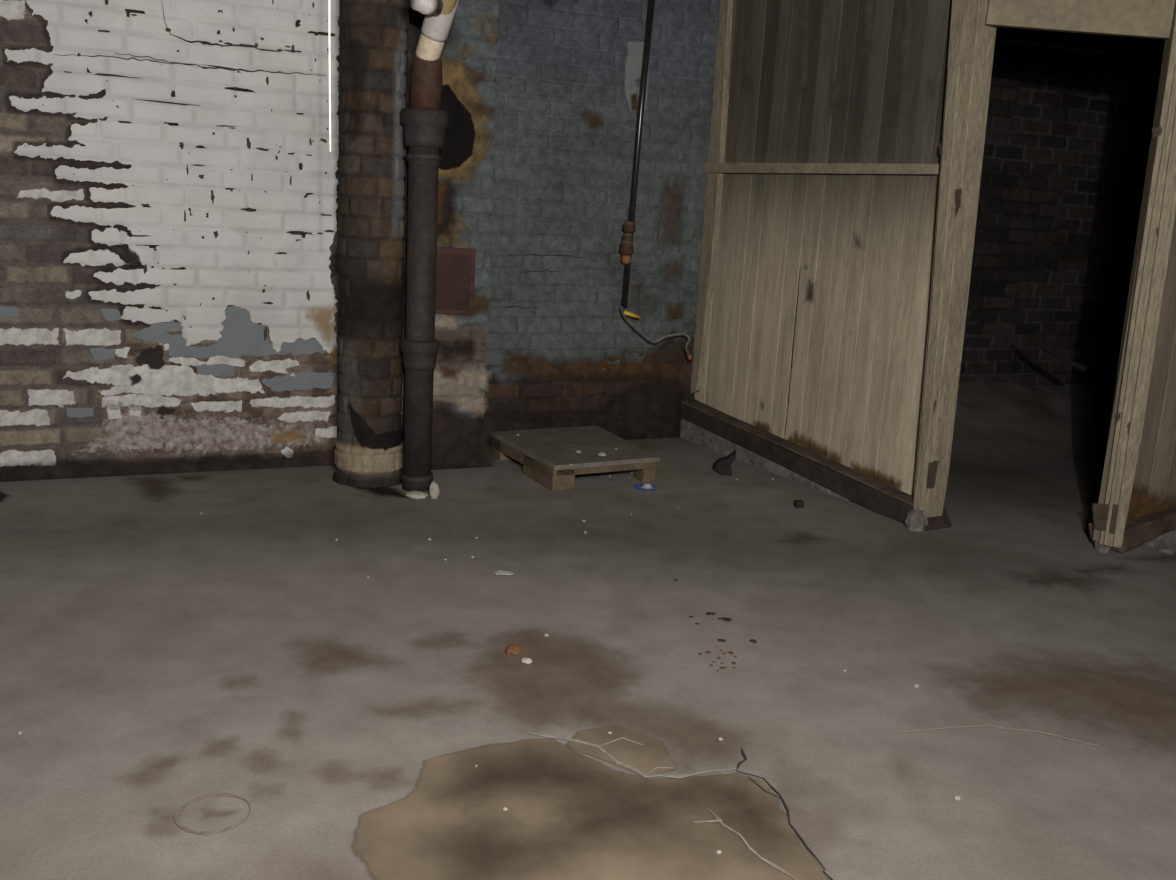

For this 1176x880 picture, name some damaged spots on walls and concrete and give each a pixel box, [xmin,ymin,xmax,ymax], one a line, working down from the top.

peeling [0,0,339,438]
peeling [0,449,56,467]
spalling [349,403,402,450]
rust [503,352,678,379]
damp [352,726,828,880]
crack [528,732,833,880]